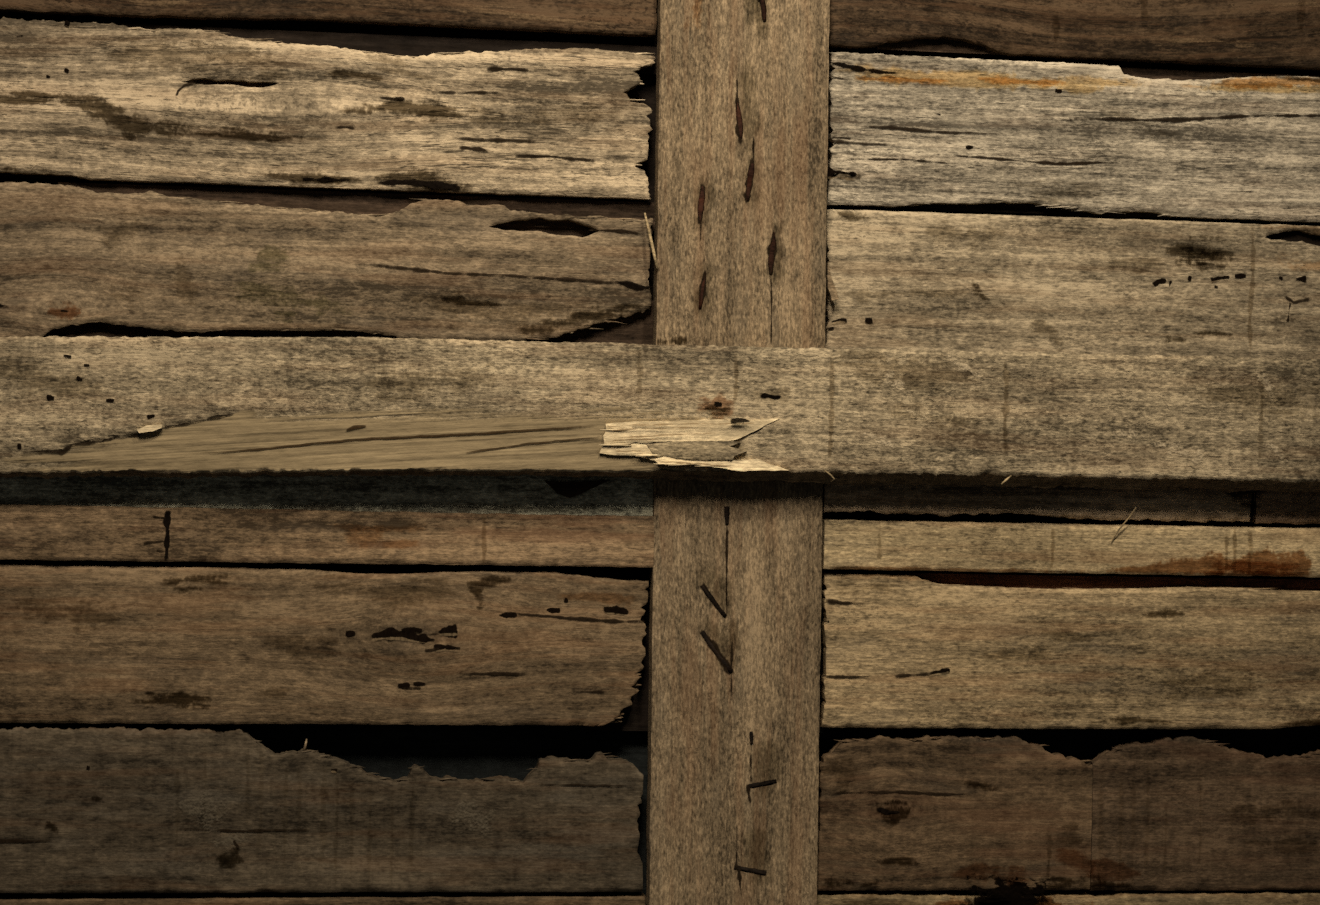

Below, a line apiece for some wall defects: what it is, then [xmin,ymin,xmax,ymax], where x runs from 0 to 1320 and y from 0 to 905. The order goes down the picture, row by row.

crack [176,81,196,95]
corrosion [735,79,755,202]
corrosion [767,231,777,341]
spalling [5,407,708,498]
corrosion [701,630,734,695]